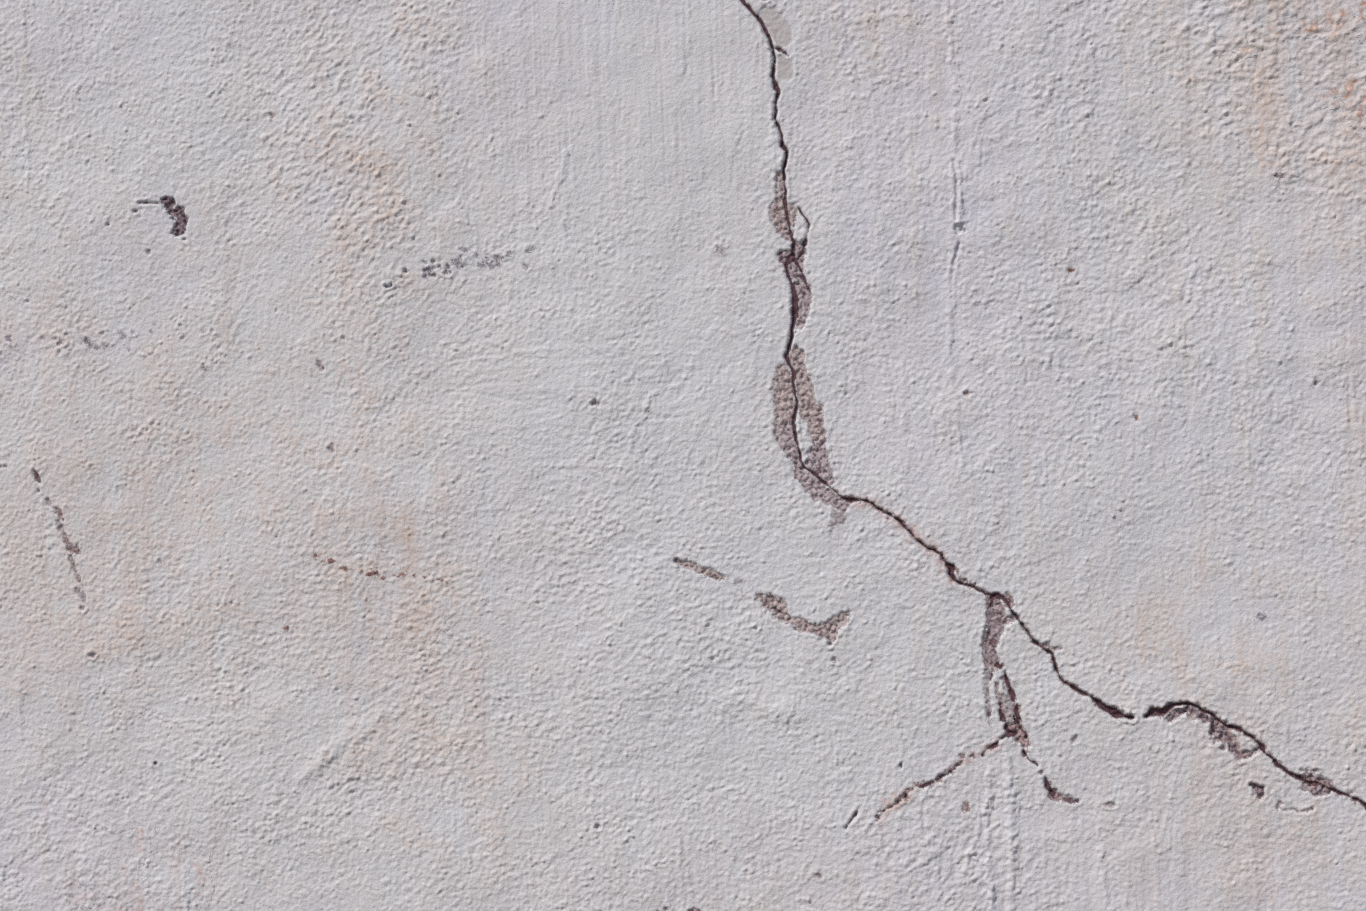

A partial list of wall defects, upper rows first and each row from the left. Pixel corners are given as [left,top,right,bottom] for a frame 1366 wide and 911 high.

flaking render [134,196,189,240]
crack [740,0,1366,829]
peeling [674,558,851,663]